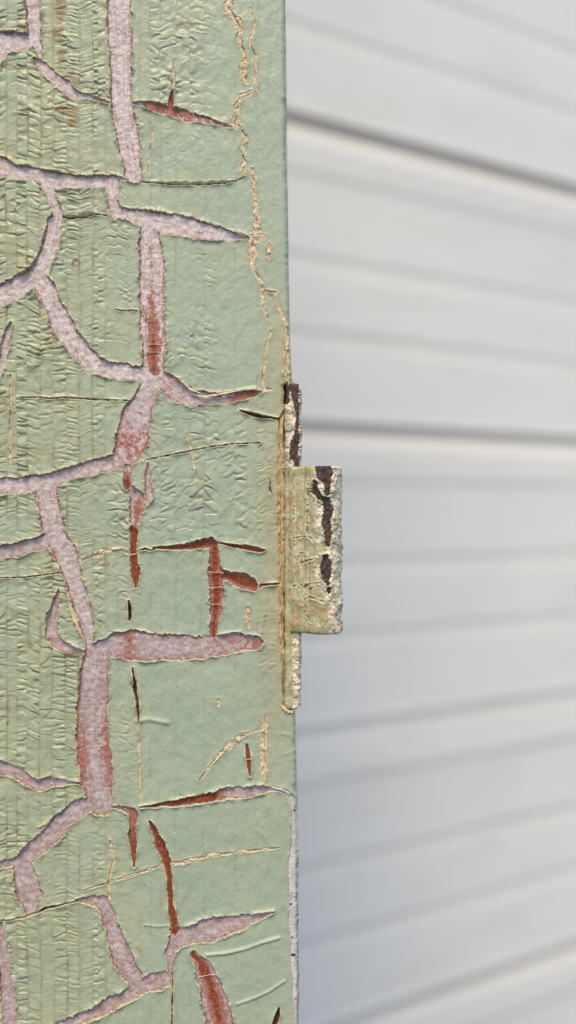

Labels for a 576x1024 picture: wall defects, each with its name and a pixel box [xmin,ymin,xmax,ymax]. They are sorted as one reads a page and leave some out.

peeling [223,0,294,392]
crack [0,0,289,1024]
rust [285,383,299,467]
rust [311,466,333,594]
peeling [259,714,298,1024]